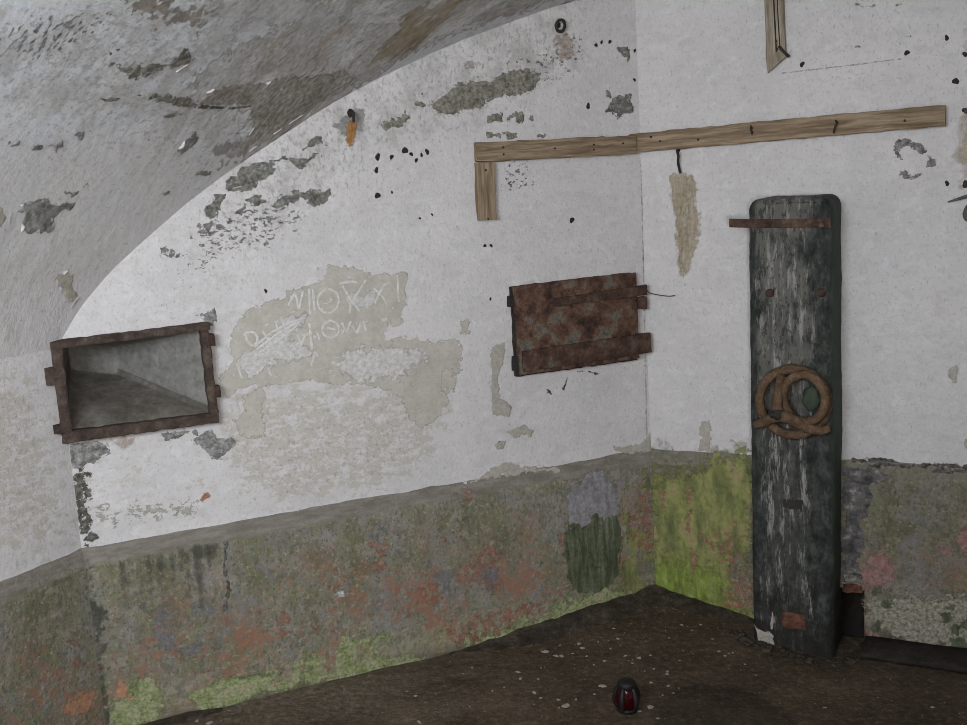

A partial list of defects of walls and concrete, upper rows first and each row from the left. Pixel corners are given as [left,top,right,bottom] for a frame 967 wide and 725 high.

peeling [617,46,630,62]
peeling [381,33,581,140]
peeling [605,90,634,120]
peeling [32,139,67,153]
peeling [104,0,549,272]
peeling [0,183,88,234]
peeling [53,269,80,308]
peeling [161,264,471,460]
leakage [73,468,99,547]
leakage [562,467,623,596]
leakage [182,545,217,591]